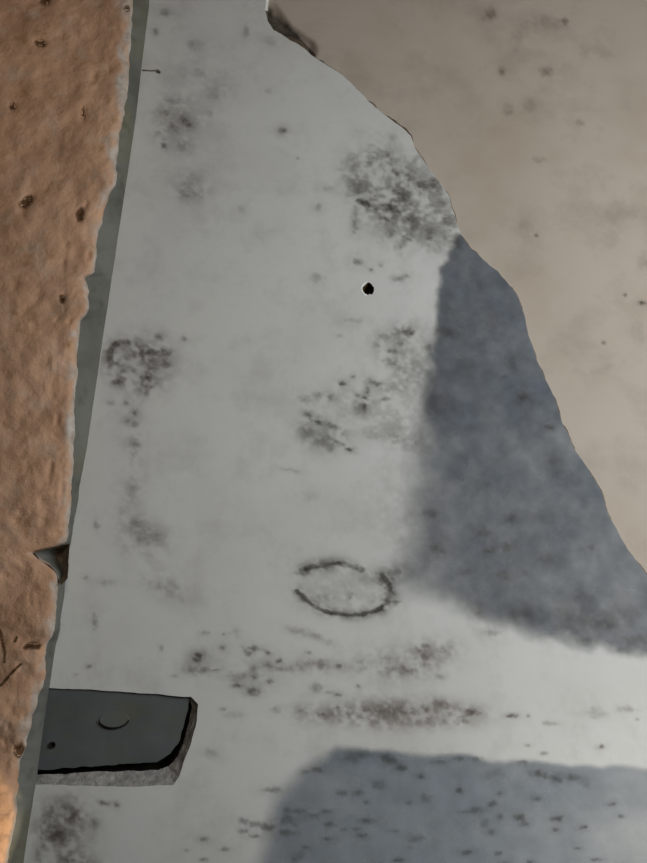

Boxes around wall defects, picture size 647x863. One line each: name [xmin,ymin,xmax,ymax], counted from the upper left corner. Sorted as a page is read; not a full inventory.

spalling [265,0,647,574]
water stain [296,590,384,616]